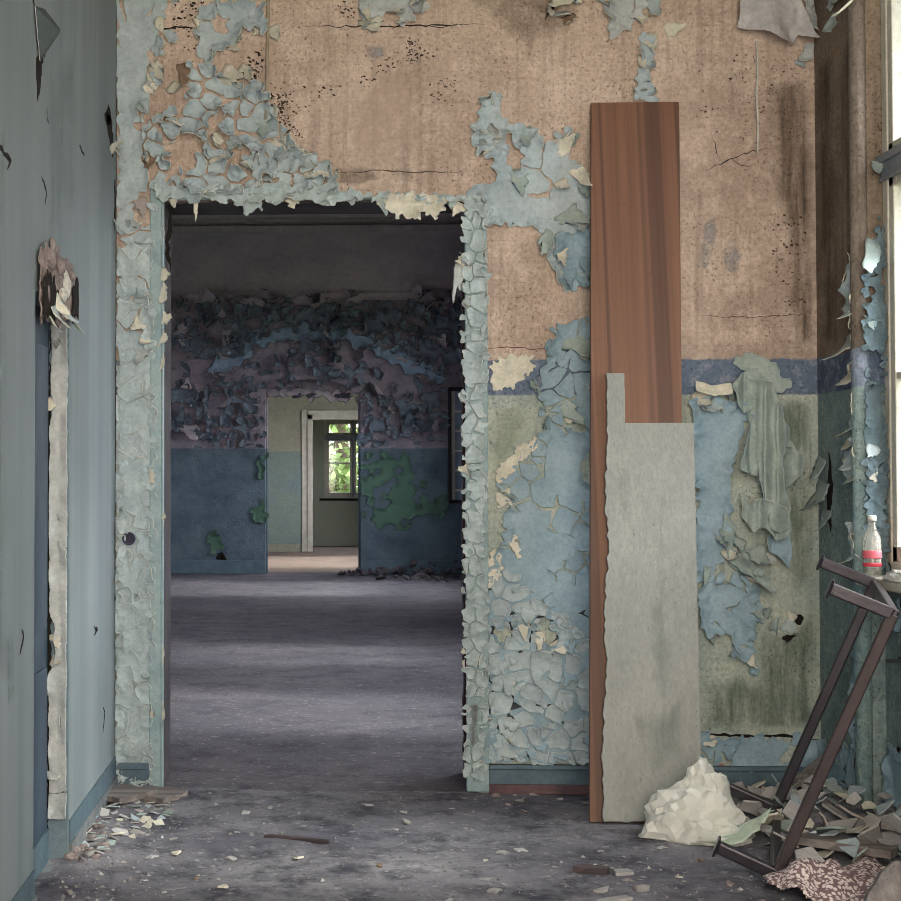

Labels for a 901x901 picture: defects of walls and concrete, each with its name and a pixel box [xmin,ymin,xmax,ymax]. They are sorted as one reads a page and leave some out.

peeling [596,0,687,102]
peeling [737,0,854,77]
peeling [871,160,884,174]
peeling [688,214,892,676]
peeling [38,238,85,829]
peeling [802,707,901,868]